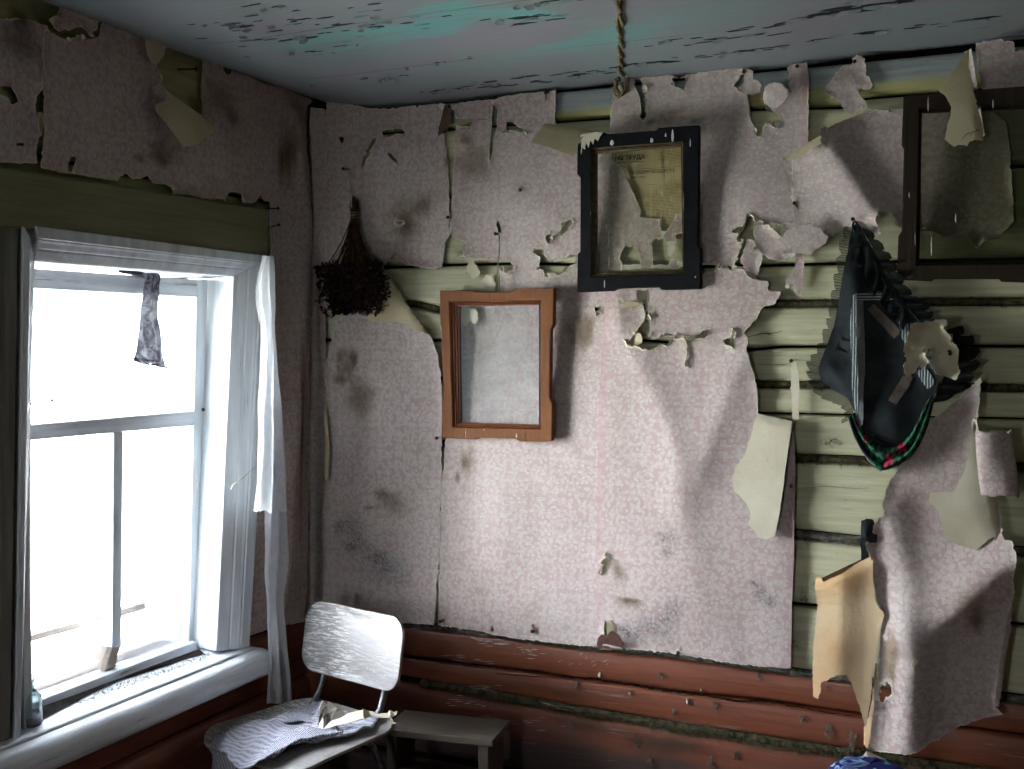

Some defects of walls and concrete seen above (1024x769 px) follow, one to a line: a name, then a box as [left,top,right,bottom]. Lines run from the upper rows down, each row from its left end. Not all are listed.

peeling [188,3,428,56]
peeling [479,0,582,26]
peeling [645,0,929,58]
peeling [904,16,1000,29]
peeling [419,57,680,94]